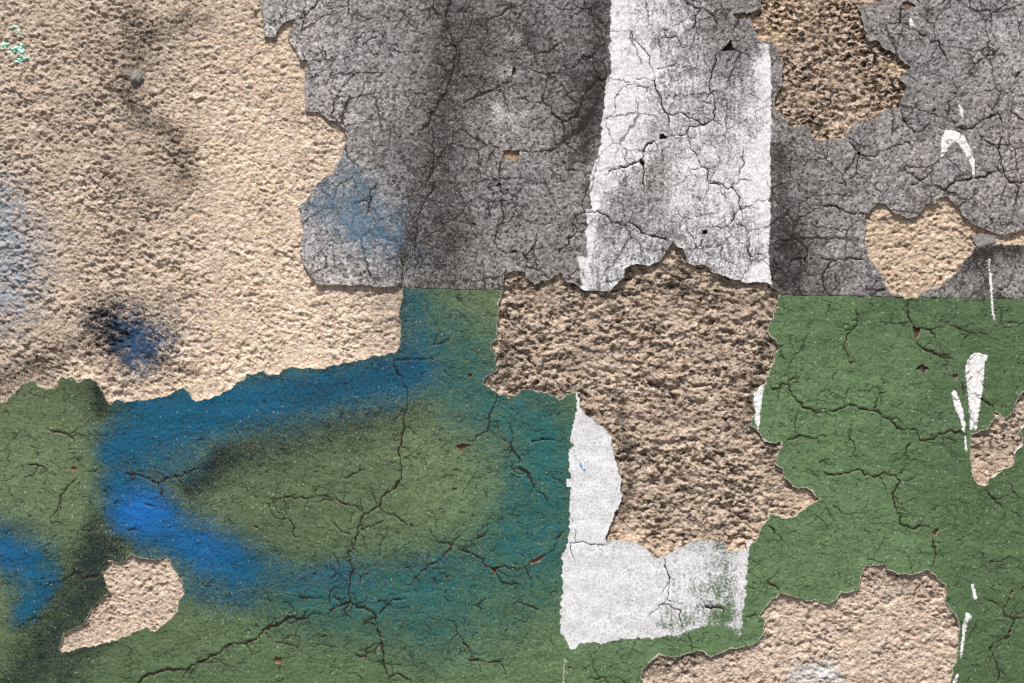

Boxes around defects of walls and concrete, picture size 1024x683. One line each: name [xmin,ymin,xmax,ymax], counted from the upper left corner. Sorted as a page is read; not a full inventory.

spalling [733,0,910,141]
spalling [0,0,403,404]
crack [298,0,1024,410]
spalling [863,196,1024,298]
crack [23,428,198,531]
crack [138,331,611,683]
spalling [468,242,820,558]
crack [769,351,971,568]
crack [986,484,1023,519]
spalling [60,554,184,652]
spalling [641,564,959,683]
crack [983,597,1024,682]